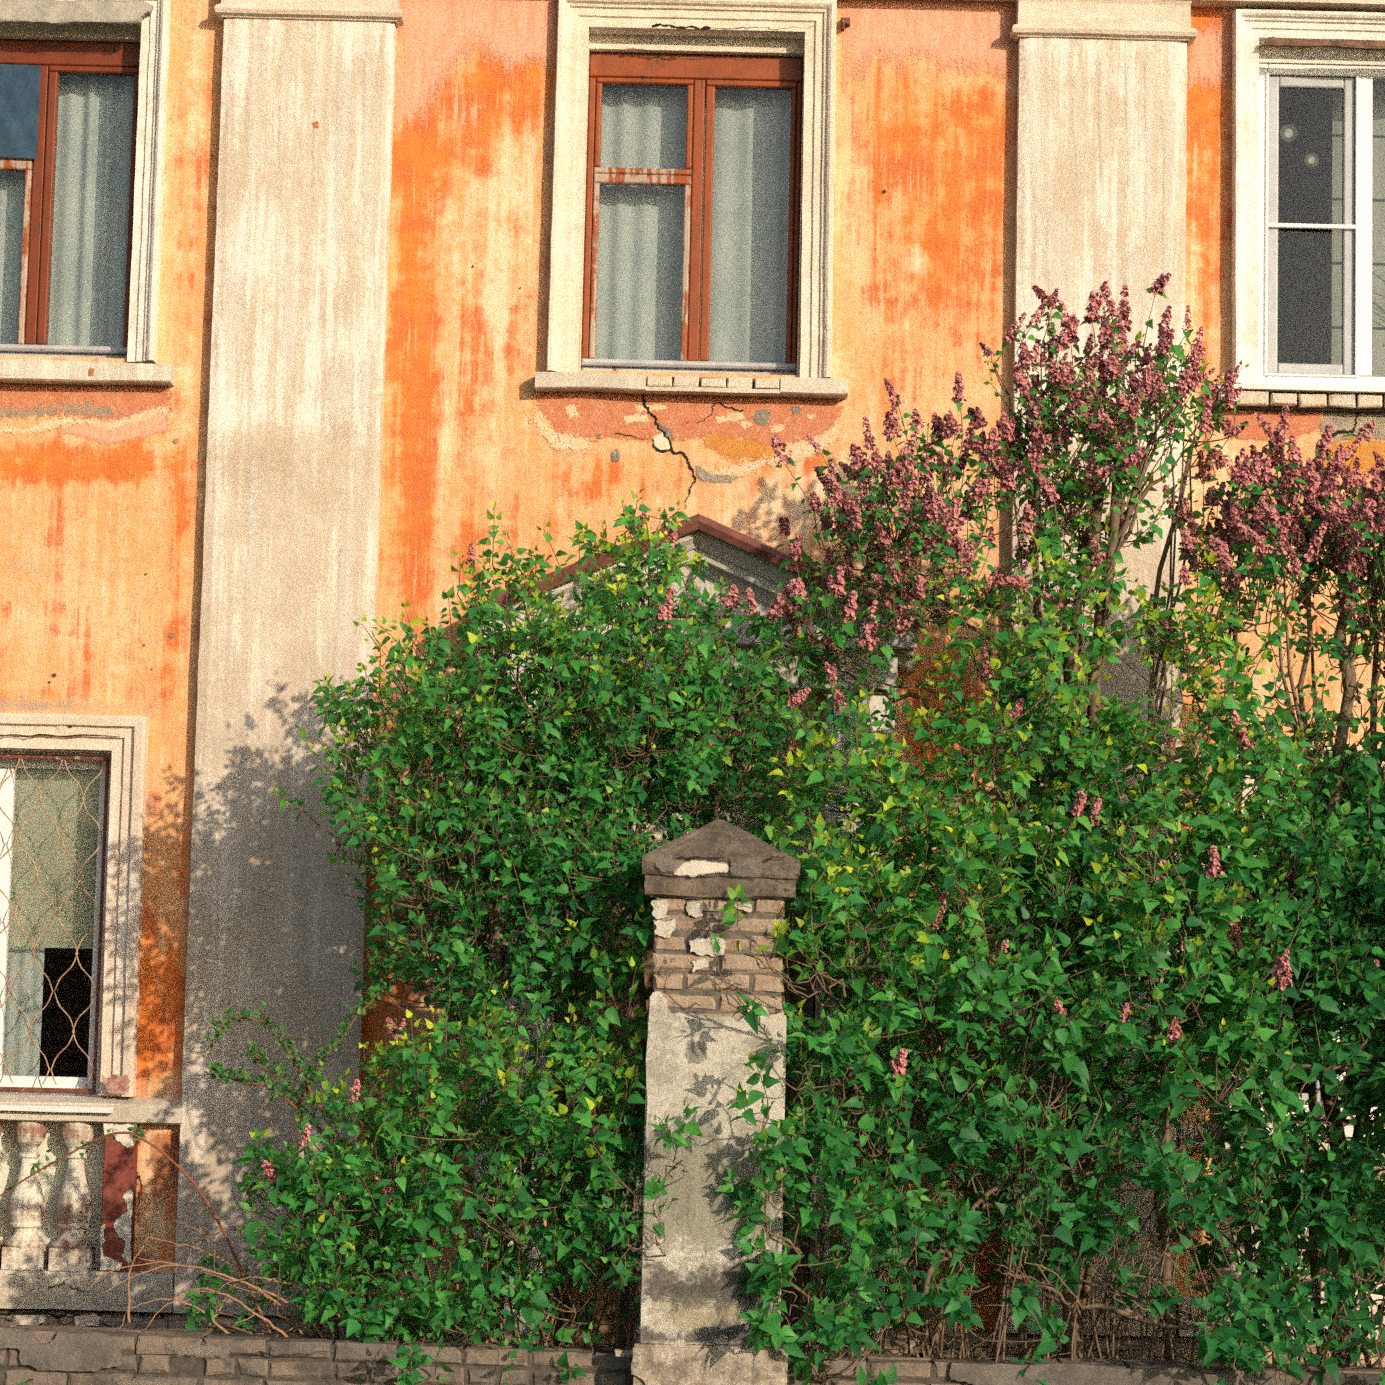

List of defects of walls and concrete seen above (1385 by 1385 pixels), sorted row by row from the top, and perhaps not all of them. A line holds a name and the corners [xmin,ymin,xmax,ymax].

peeling [0,383,173,445]
crack [615,394,744,511]
peeling [529,391,846,482]
spalling [1222,410,1385,476]
peeling [674,860,728,877]
peeling [103,1123,134,1148]
peeling [100,1190,133,1271]